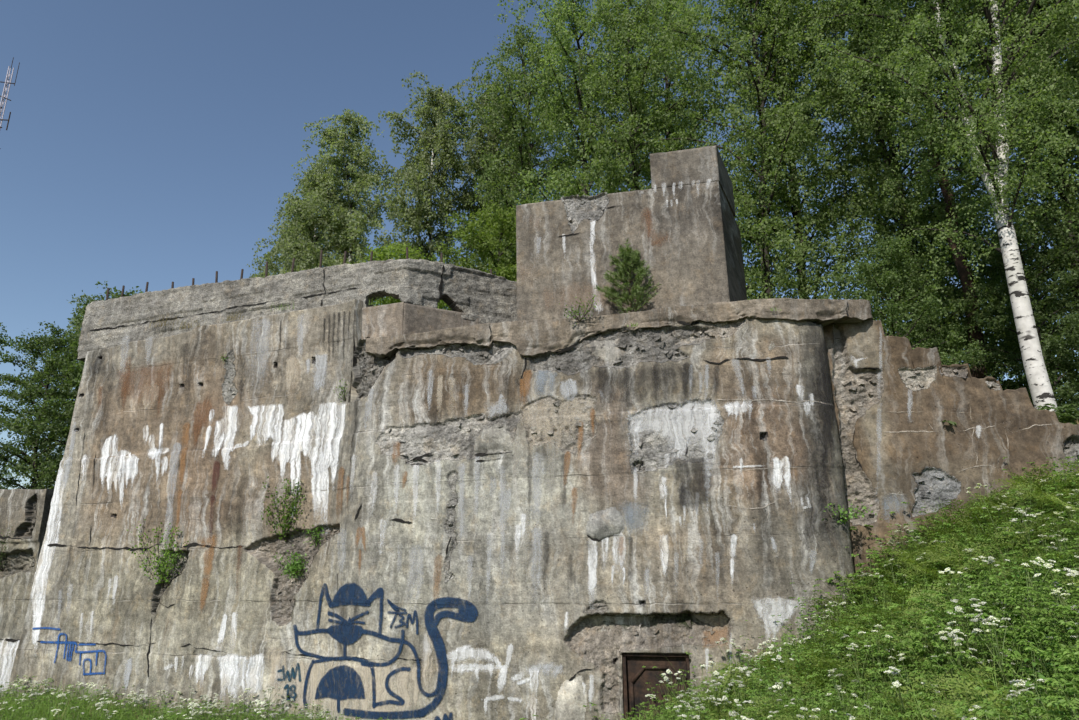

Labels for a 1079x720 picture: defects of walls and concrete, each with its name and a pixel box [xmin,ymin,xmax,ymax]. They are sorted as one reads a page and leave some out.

spalling [0,493,37,579]
damp [0,423,86,691]
crack [0,432,242,551]
damp [100,424,169,504]
corrosion [201,461,220,608]
damp [204,402,346,513]
spalling [347,339,511,404]
spalling [375,394,598,583]
damp [679,459,710,508]
spalling [809,321,884,526]
spalling [909,467,961,518]
crack [0,603,223,677]